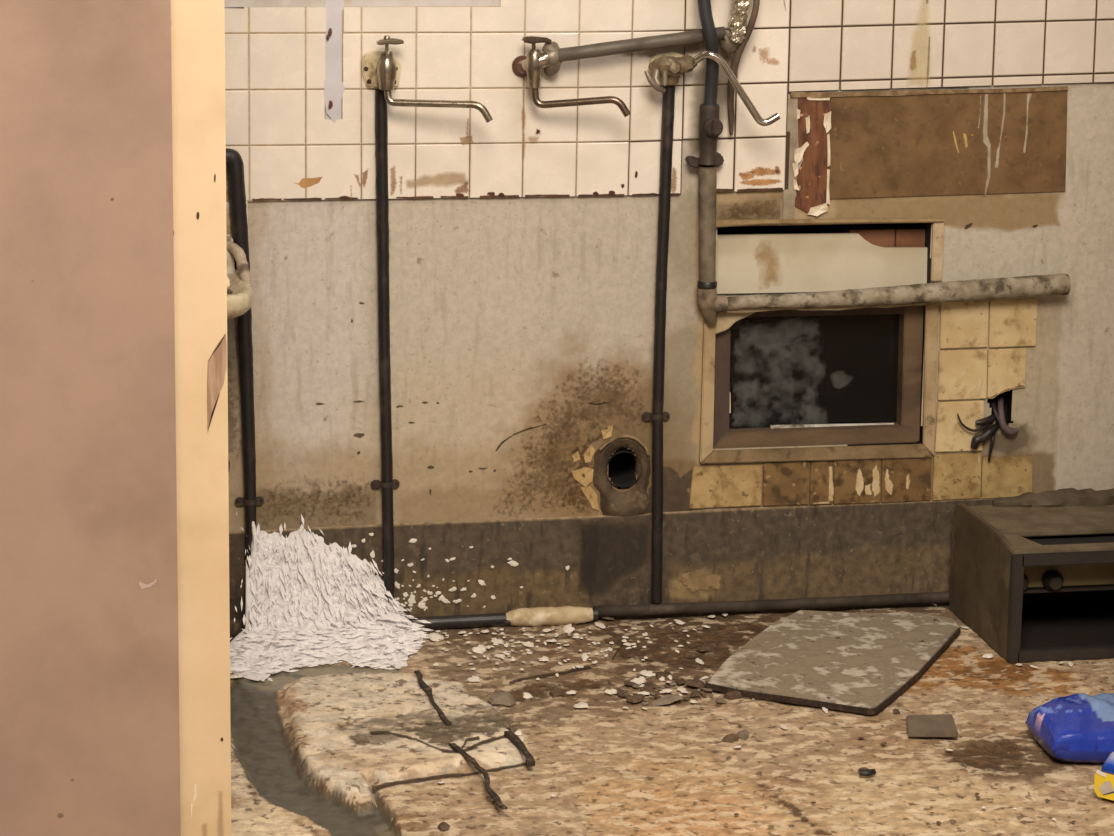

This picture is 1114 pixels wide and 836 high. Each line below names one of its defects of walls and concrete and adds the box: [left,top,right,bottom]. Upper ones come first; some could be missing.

corrosion [739,166,780,186]
peeling [716,96,831,216]
flaking render [844,226,925,247]
leakage [504,370,637,510]
flaking render [572,424,651,517]
leakage [649,467,692,513]